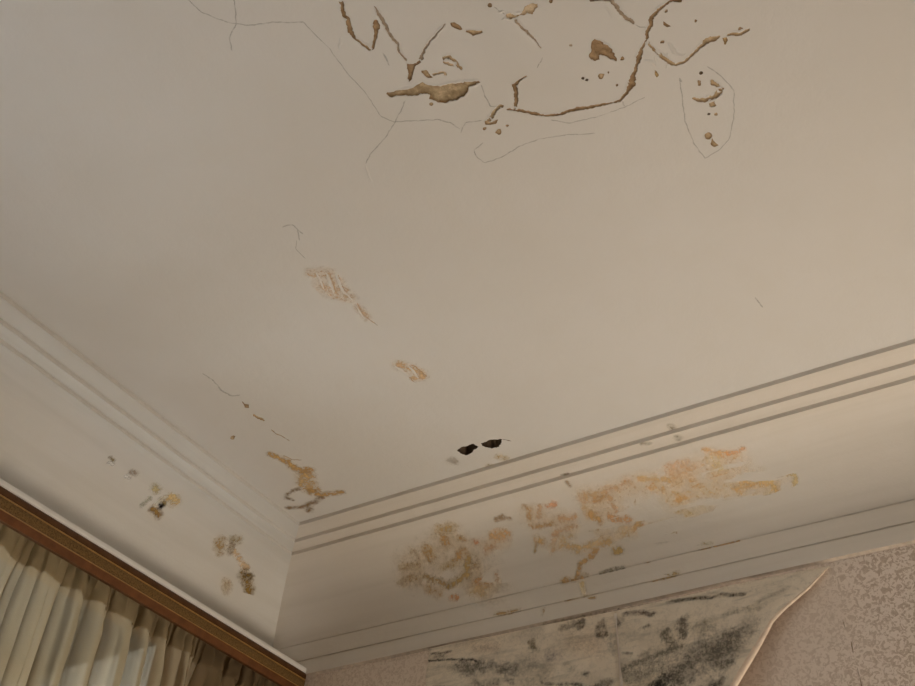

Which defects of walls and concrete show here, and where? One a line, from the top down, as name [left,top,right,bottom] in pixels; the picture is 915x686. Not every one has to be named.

crack [337,0,447,83]
spalling [385,53,482,106]
peeling [449,21,484,37]
peeling [580,38,625,82]
crack [482,0,751,136]
peeling [692,71,725,116]
peeling [703,131,720,148]
damp [216,538,254,594]
damp [525,503,623,587]
damp [622,618,728,686]